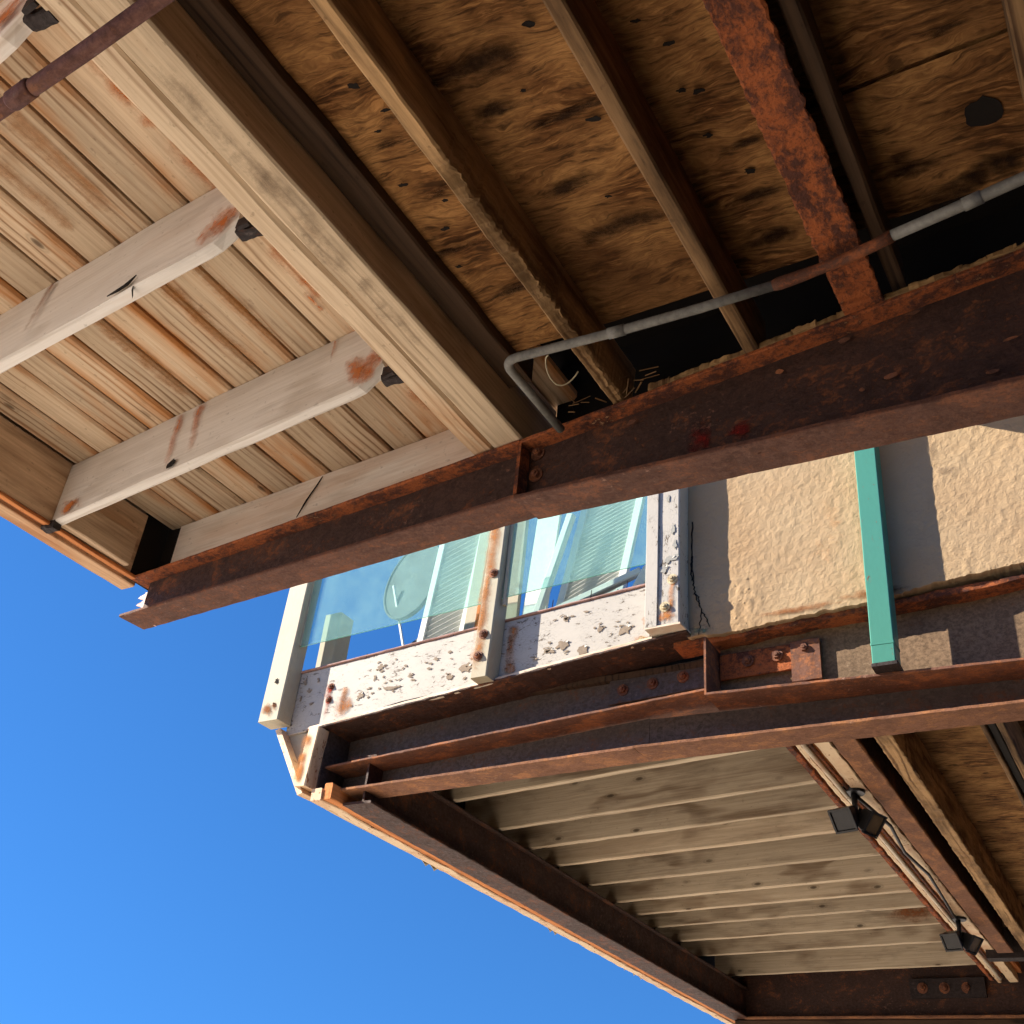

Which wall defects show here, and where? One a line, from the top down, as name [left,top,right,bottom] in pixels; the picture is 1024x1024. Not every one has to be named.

corrosion [198,208,236,240]
crack [107,275,137,297]
corrosion [348,352,380,381]
corrosion [478,529,498,630]
peeling [593,621,634,635]
peeling [530,640,588,660]
peeling [424,650,473,680]
peeling [350,658,415,707]
corrosion [326,688,350,713]